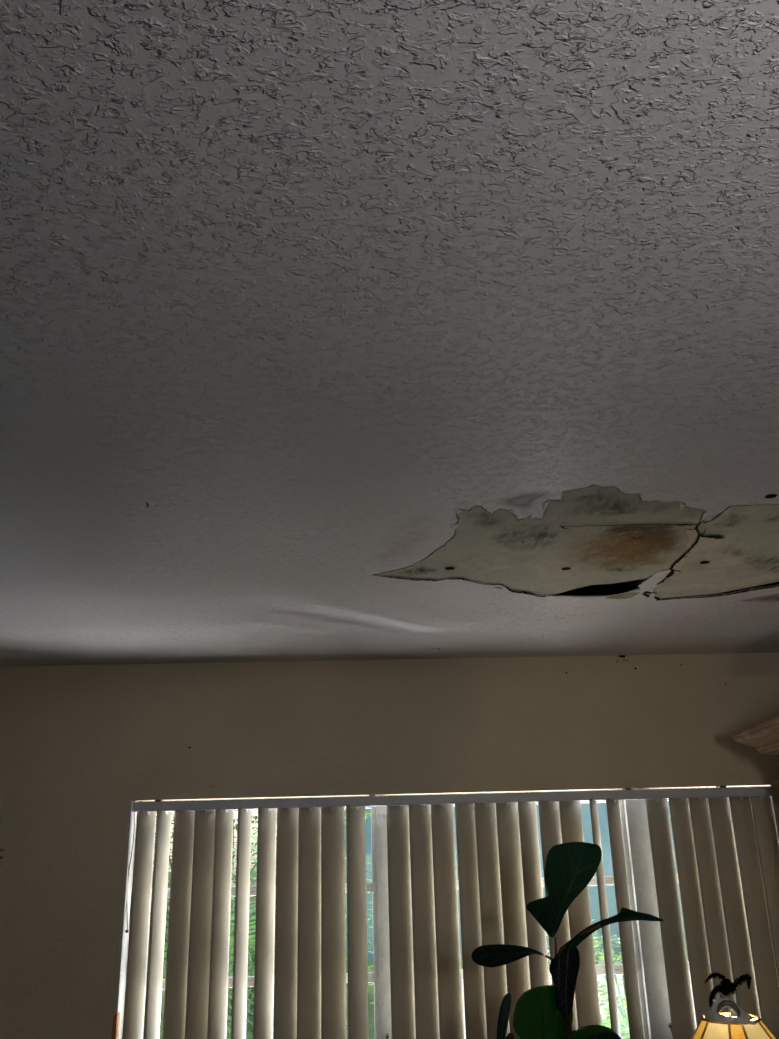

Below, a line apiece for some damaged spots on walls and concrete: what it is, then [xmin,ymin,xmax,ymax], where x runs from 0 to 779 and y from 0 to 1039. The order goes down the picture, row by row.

peeling [373,484,779,599]
crack [559,507,779,601]